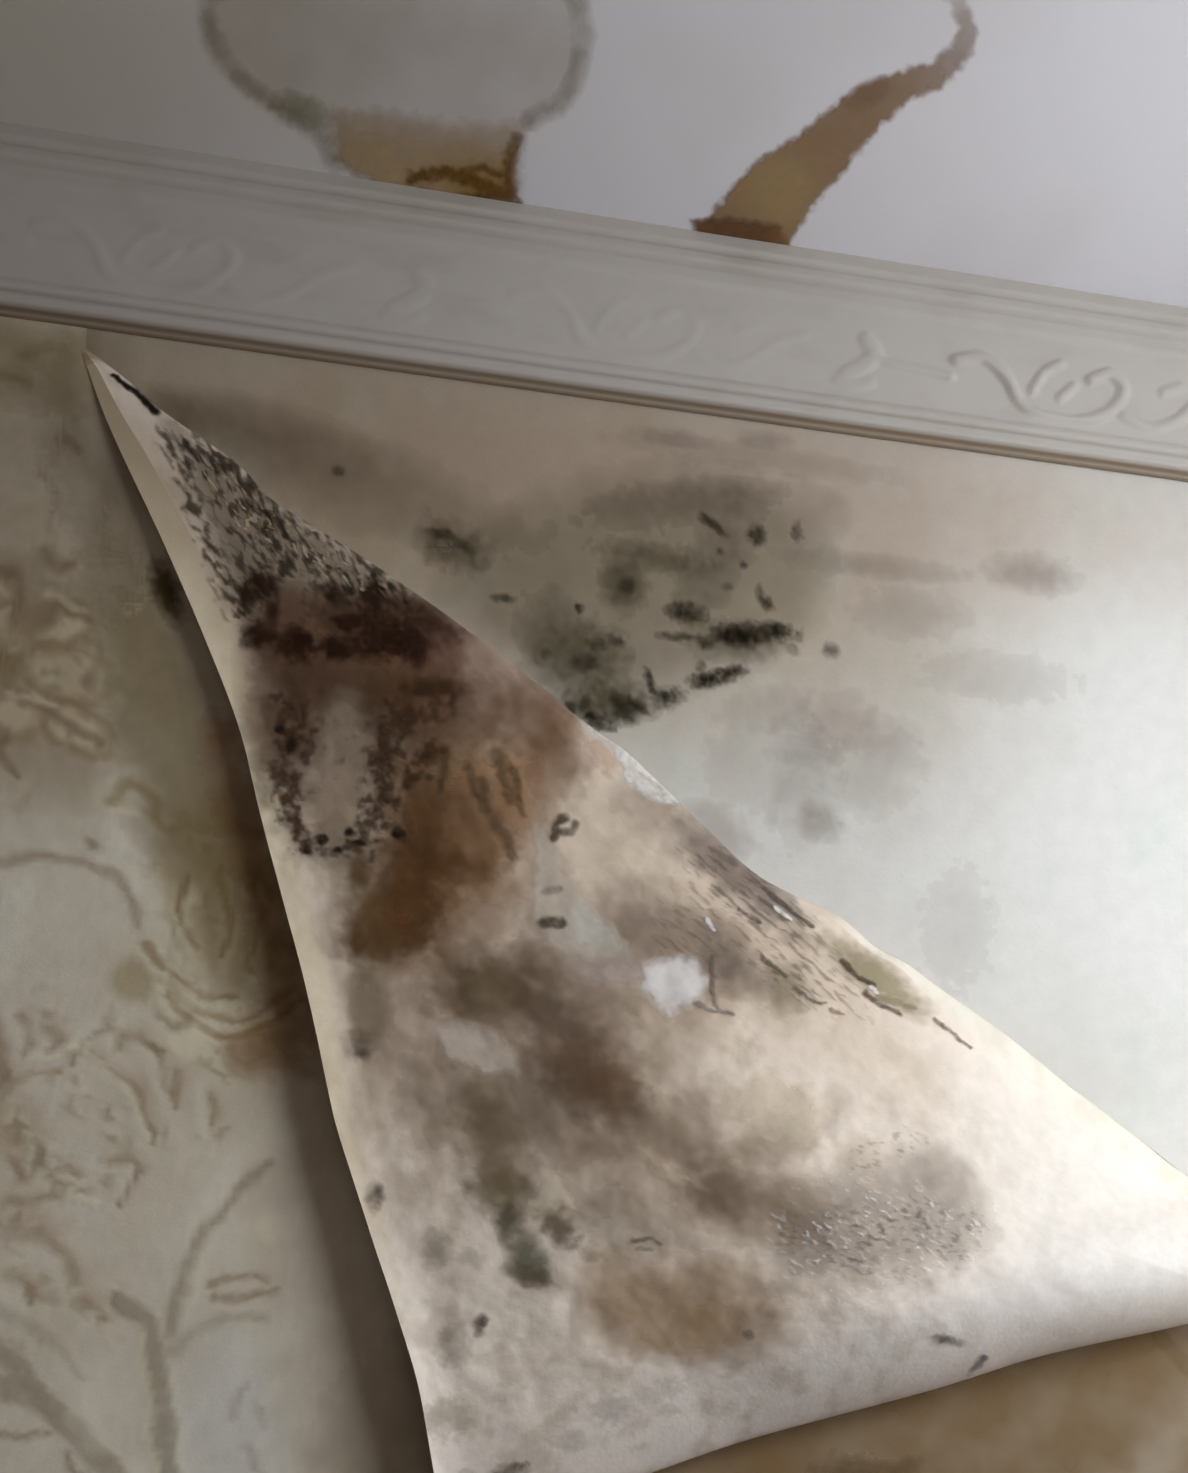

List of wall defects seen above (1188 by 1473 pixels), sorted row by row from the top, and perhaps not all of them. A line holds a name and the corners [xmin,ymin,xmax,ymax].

leakage [340,124,522,204]
leakage [111,373,161,415]
leakage [161,407,414,618]
leakage [664,599,784,648]
leakage [549,630,677,731]
leakage [693,667,740,688]
leakage [263,658,455,854]
peeling [534,827,625,980]
peeling [642,958,705,1015]
peeling [438,1023,514,1072]
peeling [530,1173,575,1210]
leakage [596,1276,749,1354]